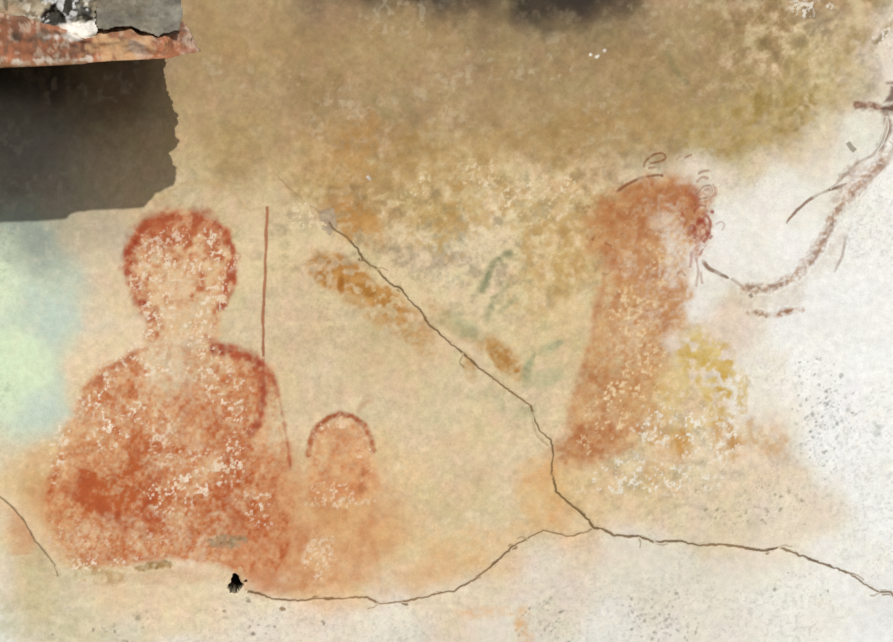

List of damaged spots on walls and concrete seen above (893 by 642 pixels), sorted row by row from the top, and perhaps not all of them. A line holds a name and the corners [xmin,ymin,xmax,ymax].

crack [0,496,61,576]
crack [247,171,893,627]